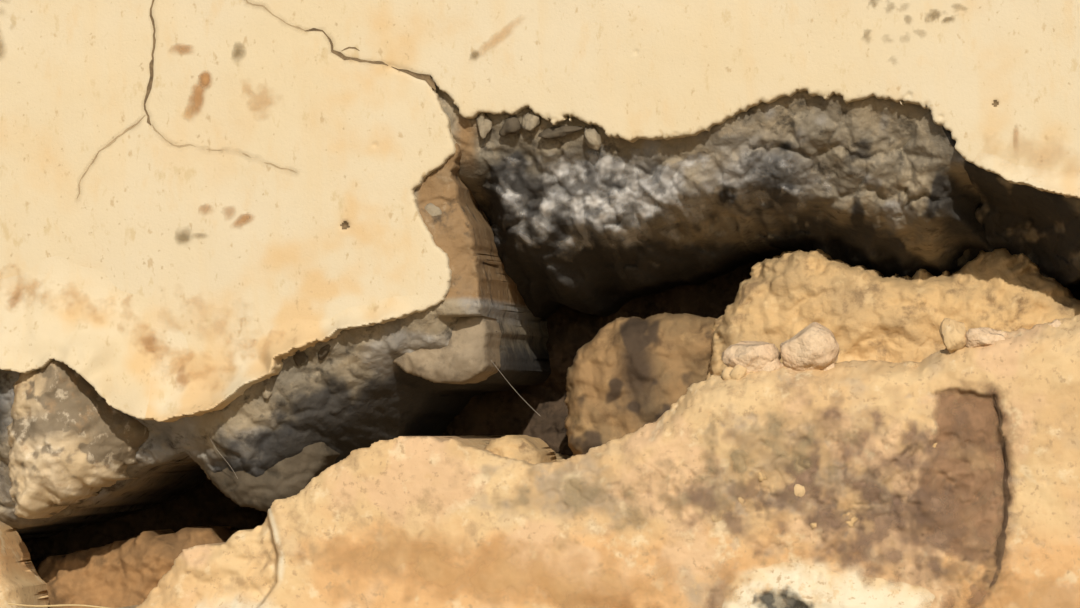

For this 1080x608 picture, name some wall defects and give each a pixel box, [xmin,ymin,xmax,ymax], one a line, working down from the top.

crack [77,0,297,198]
crack [246,0,436,90]
spalling [0,83,1080,539]
spalling [135,314,1080,608]